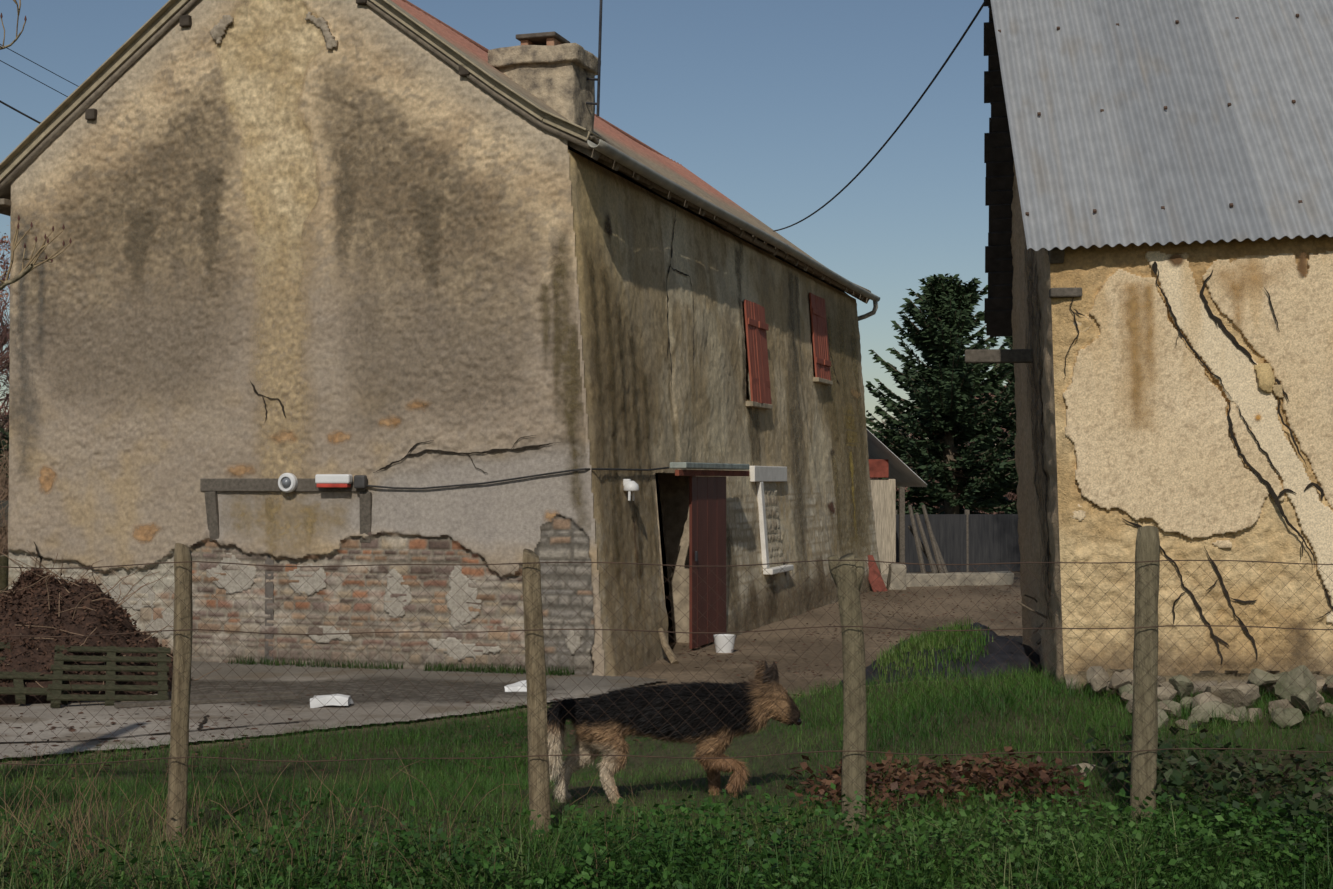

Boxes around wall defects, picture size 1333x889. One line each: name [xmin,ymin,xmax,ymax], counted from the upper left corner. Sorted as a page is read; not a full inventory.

crack [666,206,695,390]
crack [249,379,286,421]
crack [373,435,561,473]
flaking render [1062,251,1333,624]
crack [1152,261,1333,619]
flaking render [8,530,526,671]
flaking render [534,513,594,675]